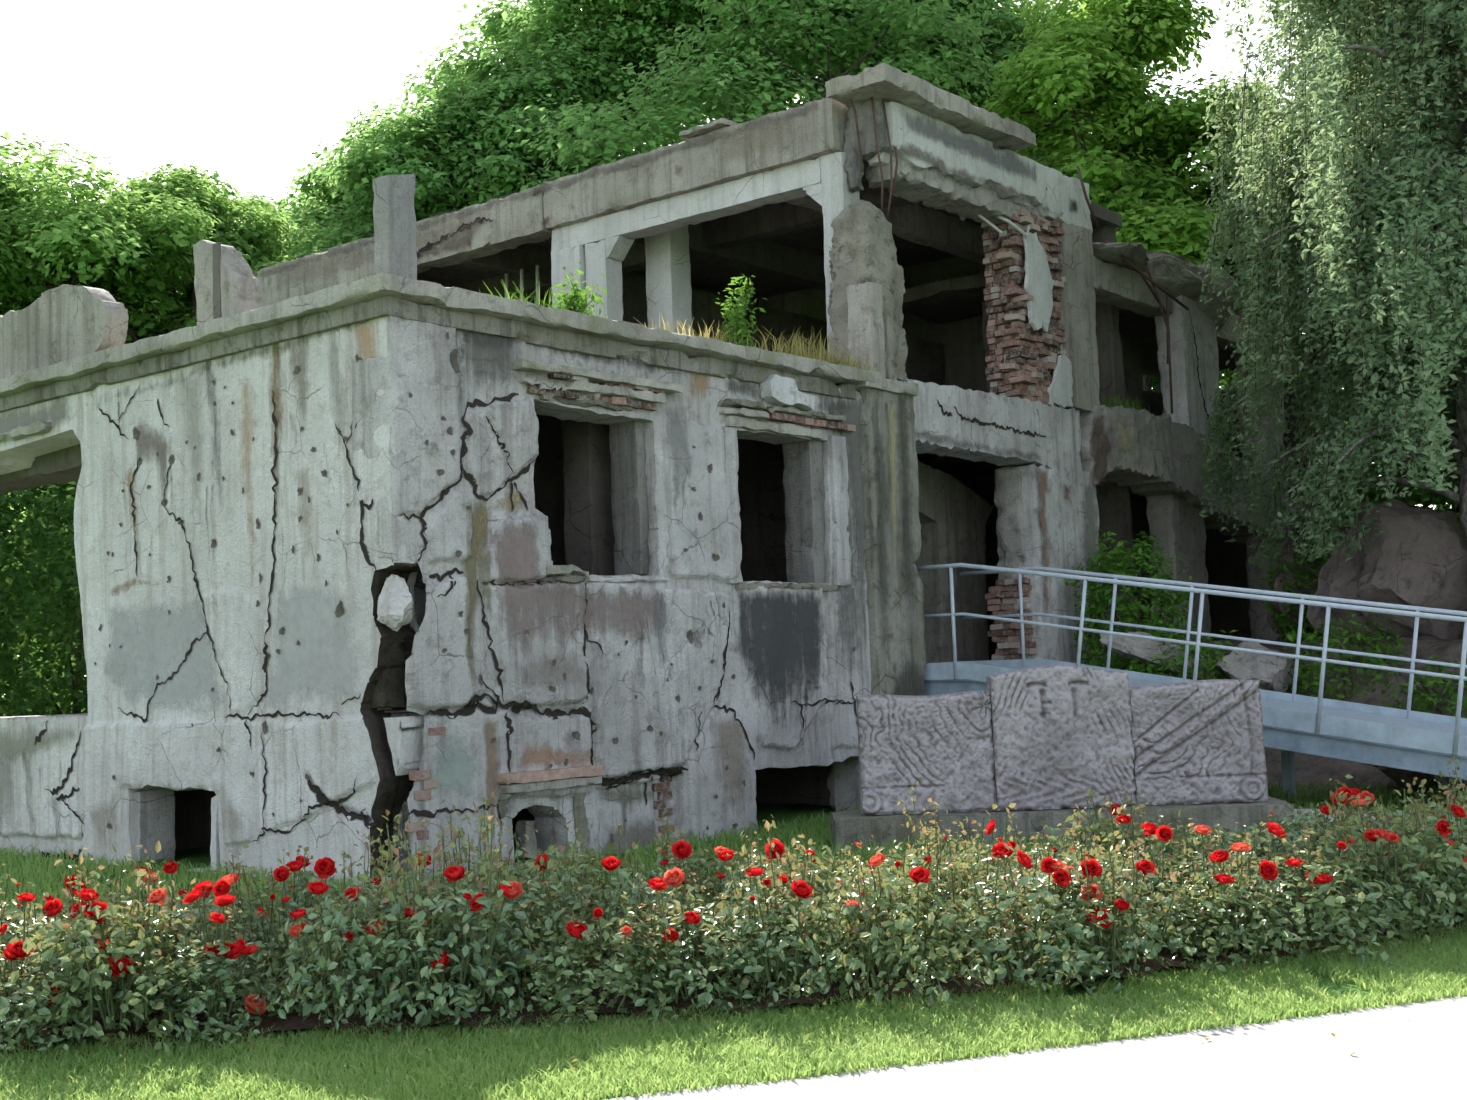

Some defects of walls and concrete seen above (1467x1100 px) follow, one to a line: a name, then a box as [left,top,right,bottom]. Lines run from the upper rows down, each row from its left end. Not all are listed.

peeling [1023,232,1053,333]
crack [938,401,1046,437]
peeling [1048,354,1073,408]
crack [98,380,755,842]
crack [34,721,84,861]